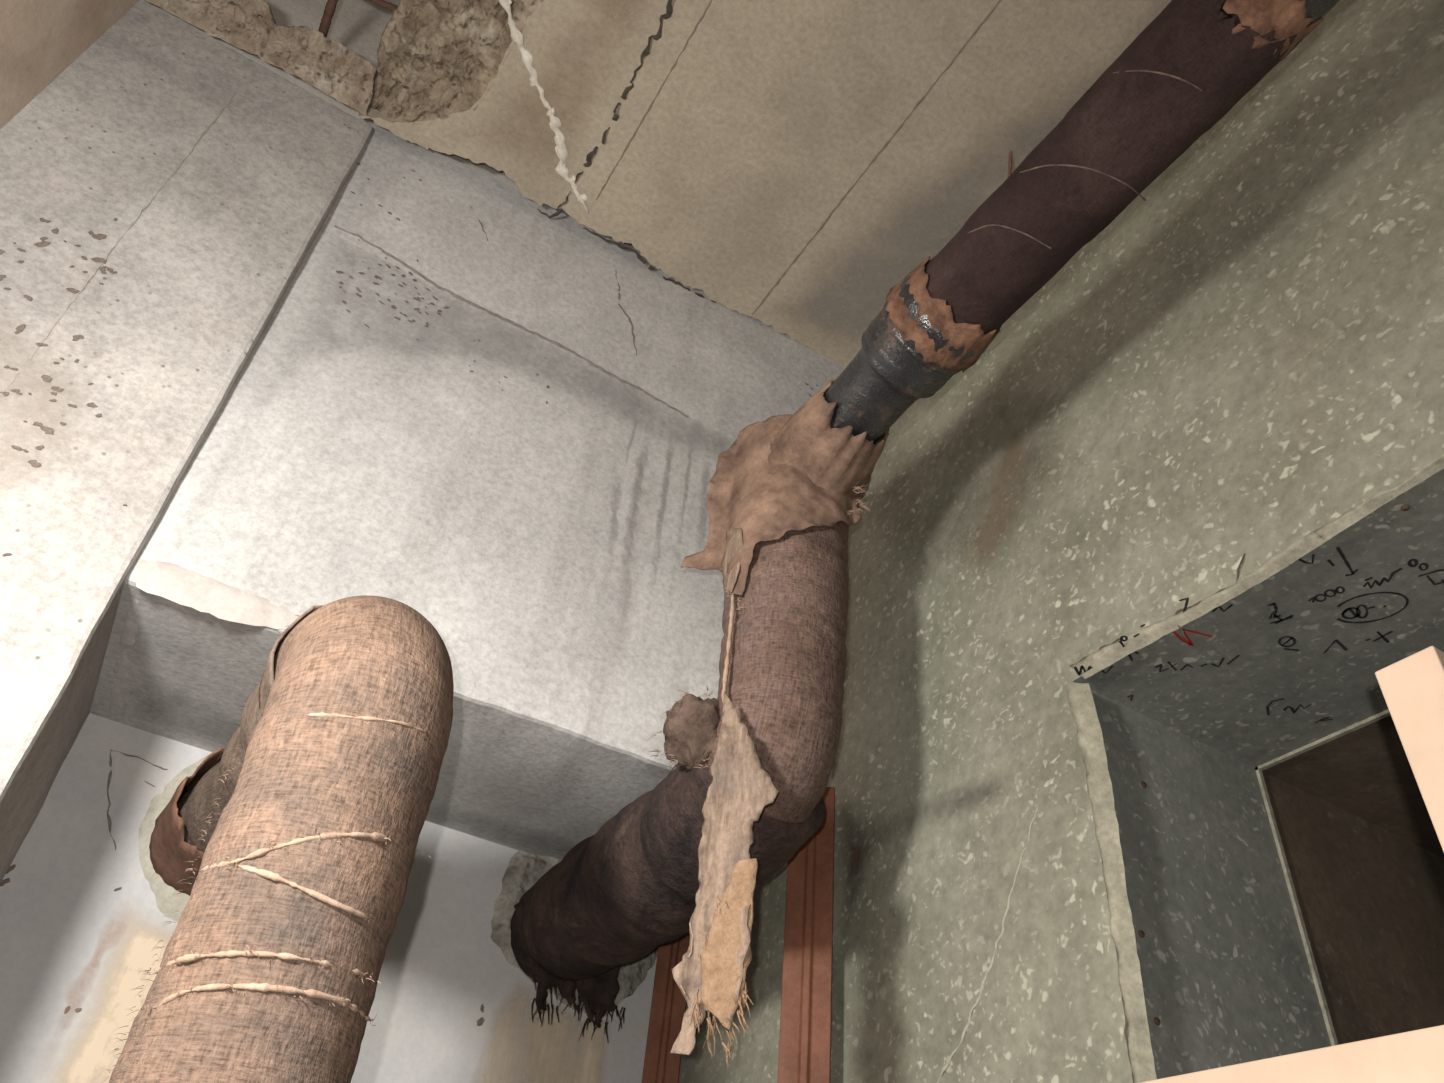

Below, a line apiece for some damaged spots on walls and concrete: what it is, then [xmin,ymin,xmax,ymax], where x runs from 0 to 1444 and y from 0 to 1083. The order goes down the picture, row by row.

spalling [144,0,550,125]
crack [499,0,716,355]